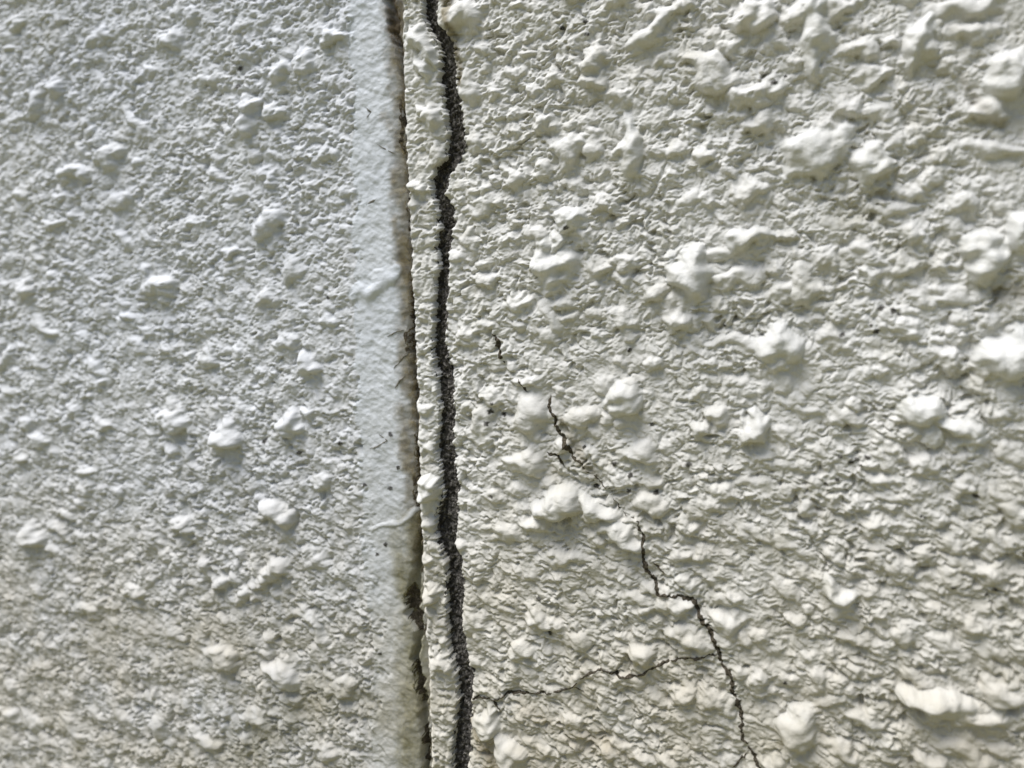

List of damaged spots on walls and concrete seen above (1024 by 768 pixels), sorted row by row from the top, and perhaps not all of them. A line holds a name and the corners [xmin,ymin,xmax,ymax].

crack [379,100,408,154]
crack [388,0,761,768]